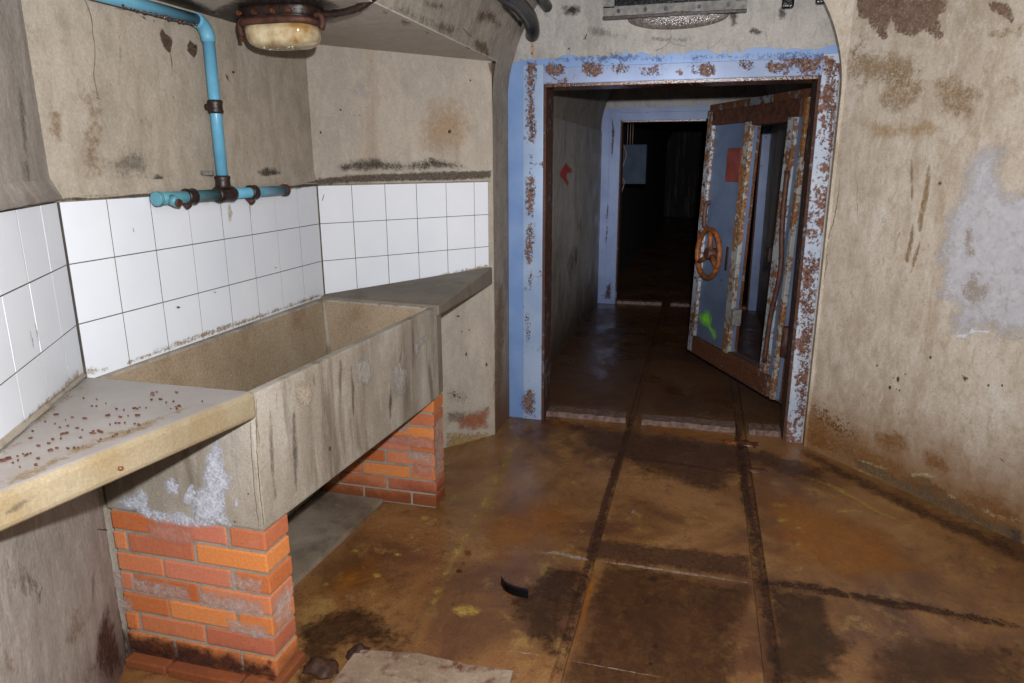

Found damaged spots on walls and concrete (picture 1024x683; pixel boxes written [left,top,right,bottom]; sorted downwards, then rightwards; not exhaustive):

corrosion [582,61,660,77]
corrosion [698,63,716,77]
corrosion [737,57,838,159]
water stain [849,53,921,108]
water stain [342,158,457,172]
corrosion [524,44,565,290]
peeling [938,149,1024,339]
corrosion [450,409,488,429]
efflorescence [119,439,237,544]